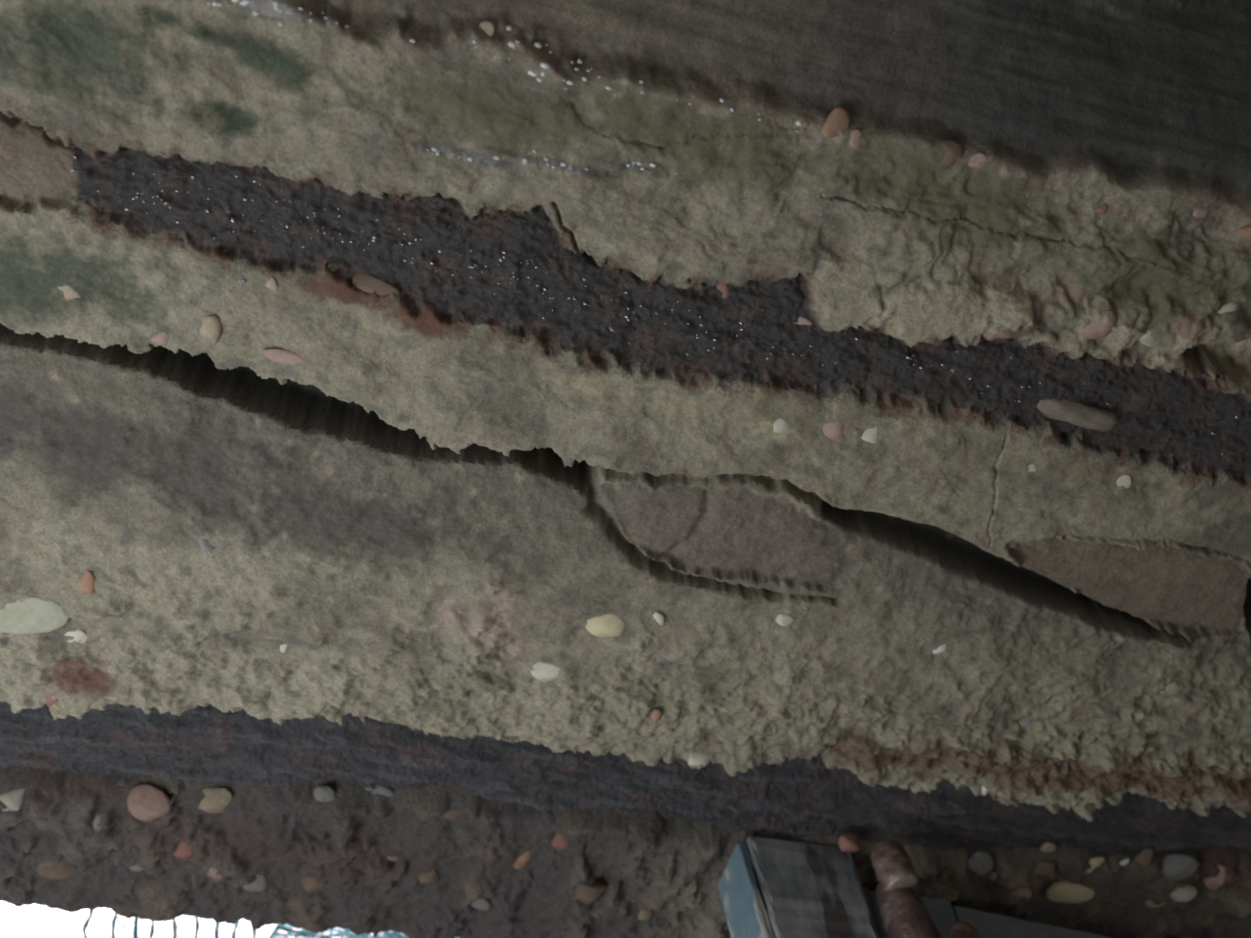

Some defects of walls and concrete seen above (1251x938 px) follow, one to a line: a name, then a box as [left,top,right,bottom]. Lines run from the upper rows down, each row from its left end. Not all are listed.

crack [552,202,579,247]
crack [0,323,1198,649]
spalling [1243,578,1251,638]
spalling [0,701,1251,938]